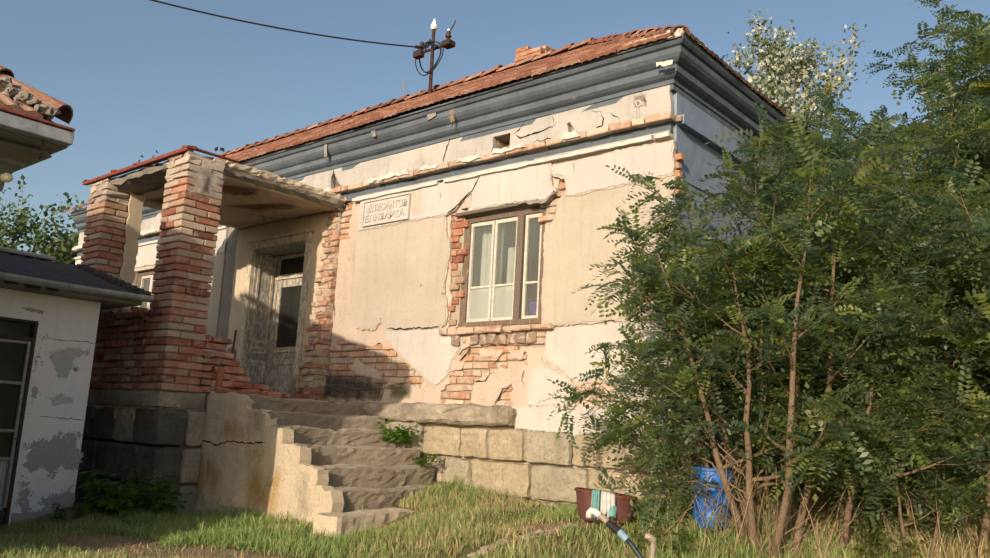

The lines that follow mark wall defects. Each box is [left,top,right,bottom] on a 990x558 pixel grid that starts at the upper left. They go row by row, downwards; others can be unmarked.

spalling [327,140,685,408]
peeling [34,335,88,377]
crack [475,352,525,403]
crack [203,439,263,447]
peeling [13,429,84,513]